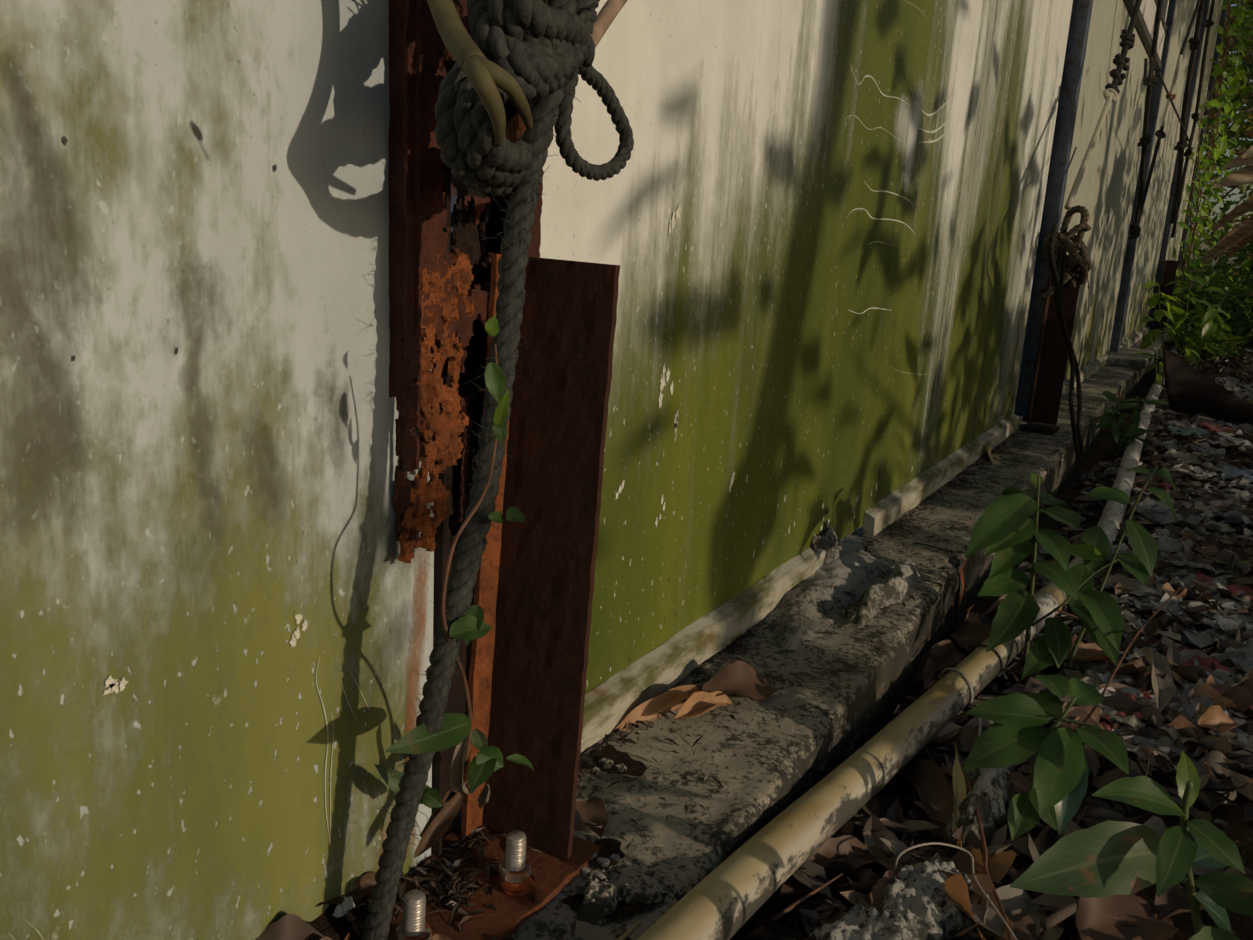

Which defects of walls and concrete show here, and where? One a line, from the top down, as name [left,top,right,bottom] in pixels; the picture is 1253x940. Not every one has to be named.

damp [11,71,71,243]
corrosion [528,188,541,257]
damp [1012,105,1053,373]
damp [0,243,80,496]
corrosion [398,0,491,733]
peeling [103,676,128,695]